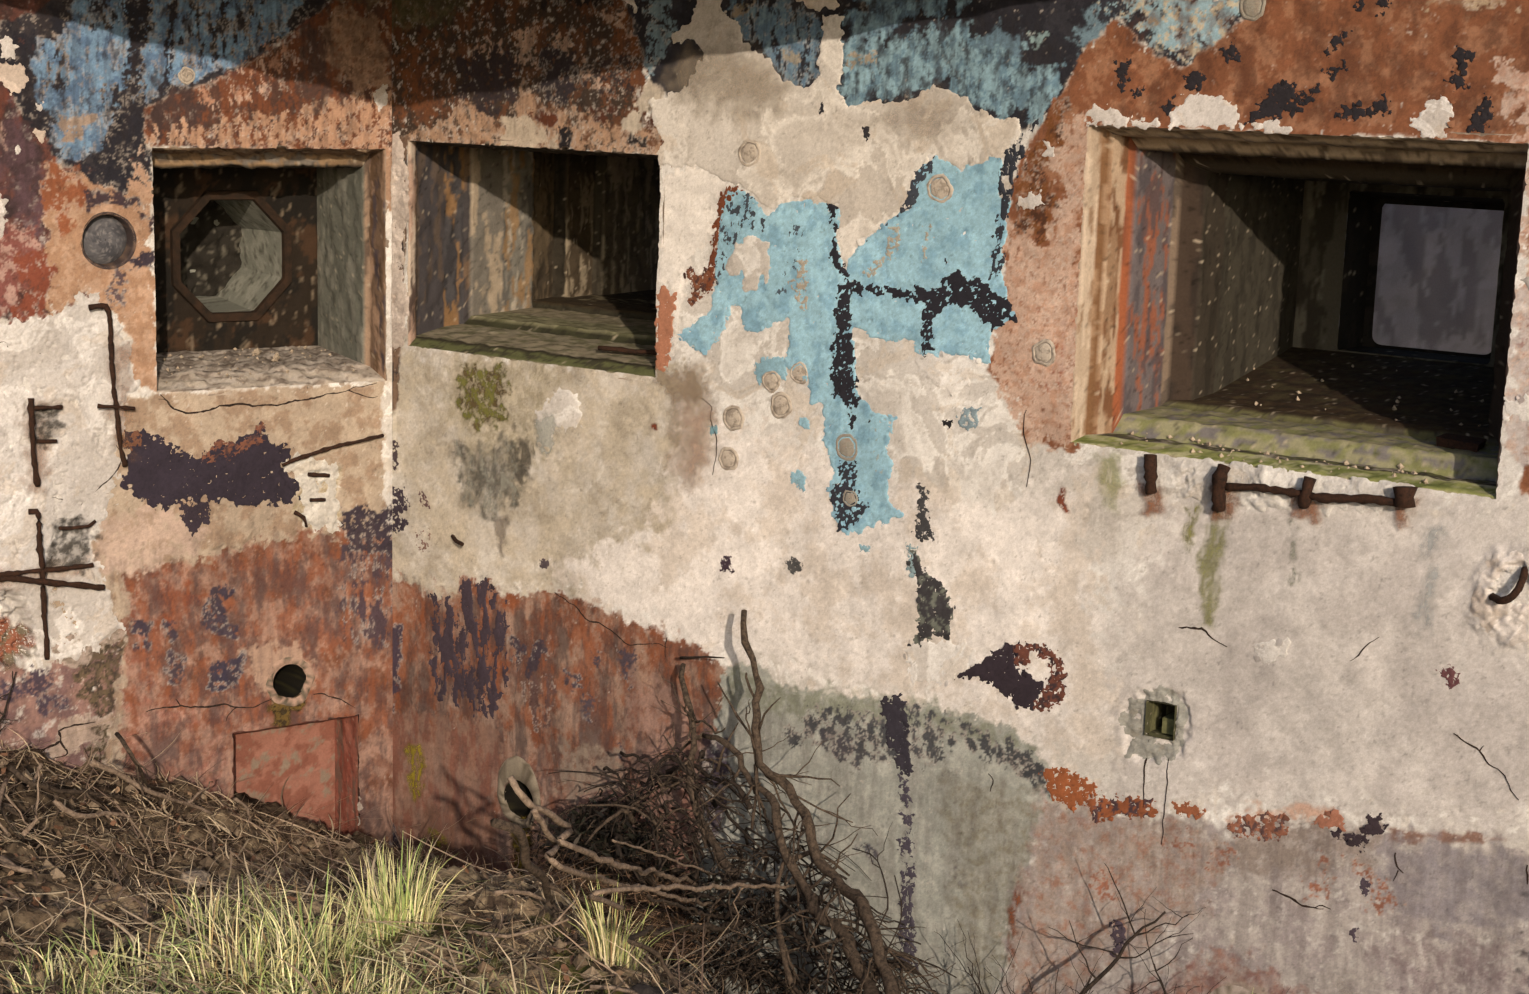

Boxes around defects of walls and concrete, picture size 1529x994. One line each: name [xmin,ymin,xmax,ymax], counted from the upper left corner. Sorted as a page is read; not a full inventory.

peeling [0,35,29,96]
peeling [1084,30,1353,135]
peeling [0,193,9,239]
crack [160,383,378,414]
spalling [0,291,431,664]
peeling [648,0,1070,971]
rust [1138,484,1163,516]
rust [1292,497,1319,524]
water stain [1199,525,1223,624]
rust [0,617,36,670]
peeling [428,576,512,719]
crack [1454,733,1519,800]